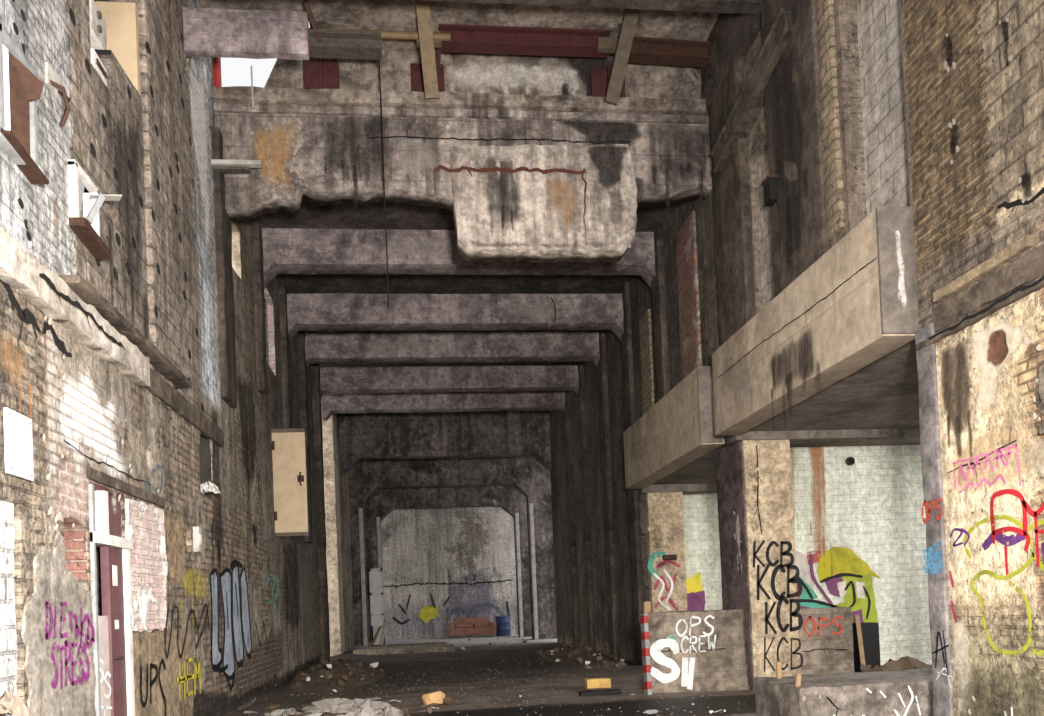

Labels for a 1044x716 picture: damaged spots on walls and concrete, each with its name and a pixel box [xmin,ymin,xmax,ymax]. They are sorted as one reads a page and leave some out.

leakage [488,149,531,230]
leakage [563,121,639,186]
crack [997,187,1044,209]
crack [0,273,126,358]
leakage [771,334,819,417]
leakage [942,346,973,468]
flaking render [21,316,132,716]
corrosion [809,447,826,558]
flaking render [113,489,194,716]